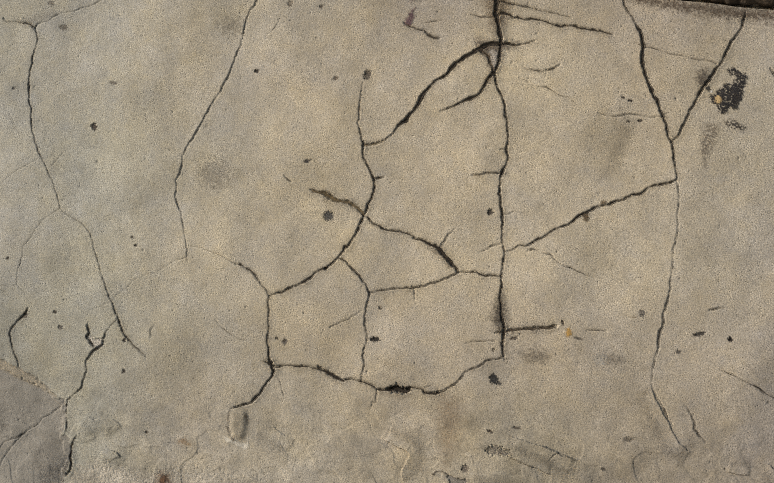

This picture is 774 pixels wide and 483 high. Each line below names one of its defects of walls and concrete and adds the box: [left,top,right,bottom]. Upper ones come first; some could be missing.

crack [0,289,151,475]
crack [229,0,746,408]